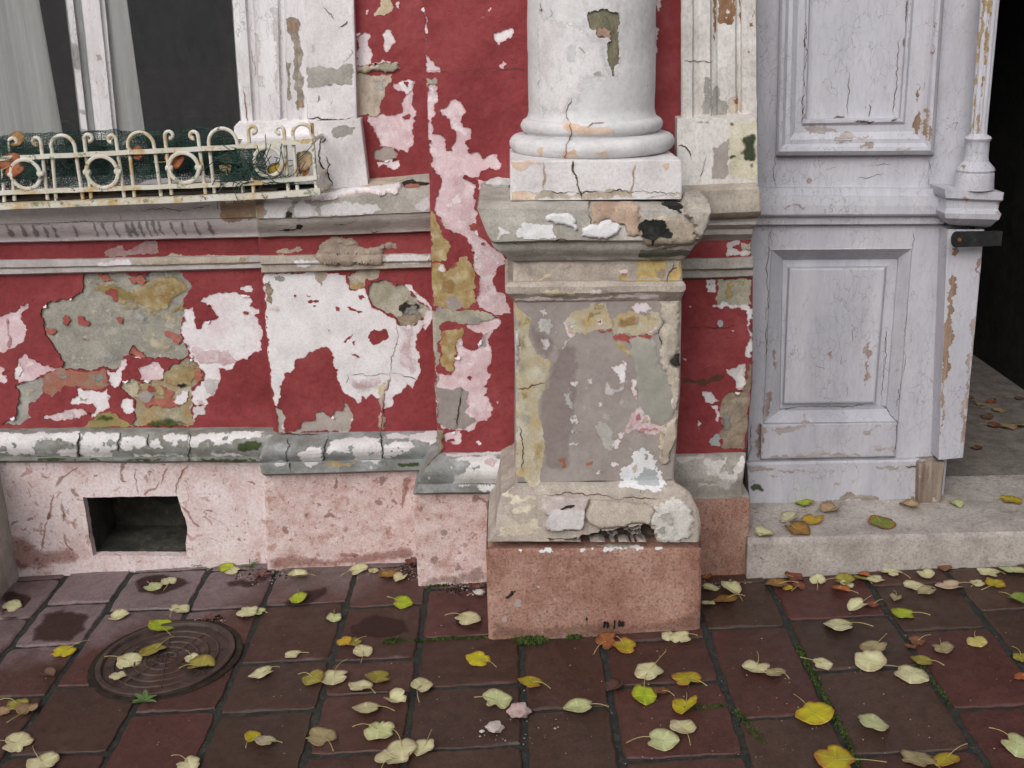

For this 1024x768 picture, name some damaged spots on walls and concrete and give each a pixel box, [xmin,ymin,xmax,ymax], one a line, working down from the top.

crack [537,101,675,224]
peeling [0,7,860,552]
peeling [940,275,957,434]
peeling [960,316,976,443]
crack [279,433,328,471]
crack [540,490,658,500]